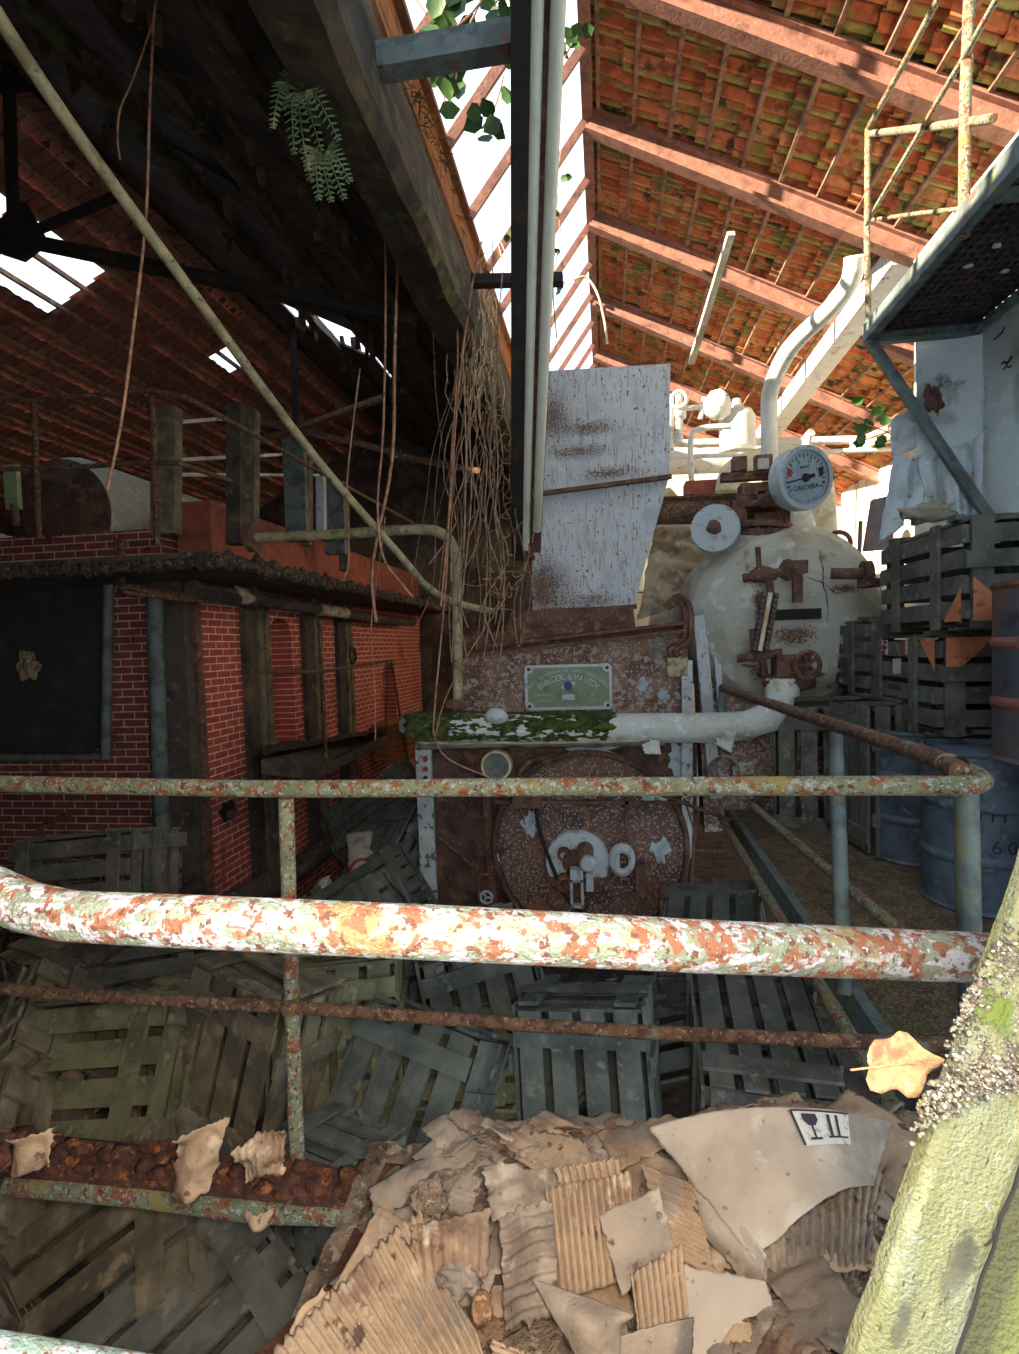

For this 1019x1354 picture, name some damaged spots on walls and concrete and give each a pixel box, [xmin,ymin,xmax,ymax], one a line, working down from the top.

damp [893,1307,910,1347]